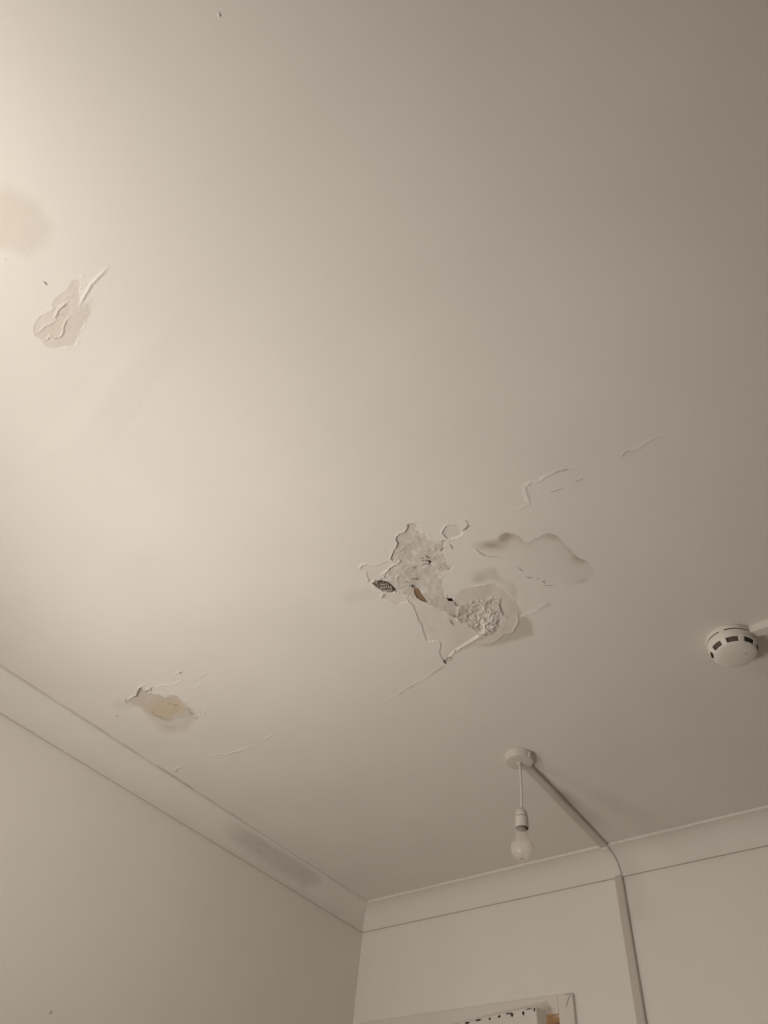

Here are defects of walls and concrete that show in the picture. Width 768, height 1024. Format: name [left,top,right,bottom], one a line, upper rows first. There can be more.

peeling [30,265,111,354]
peeling [357,520,536,667]
peeling [124,670,230,727]